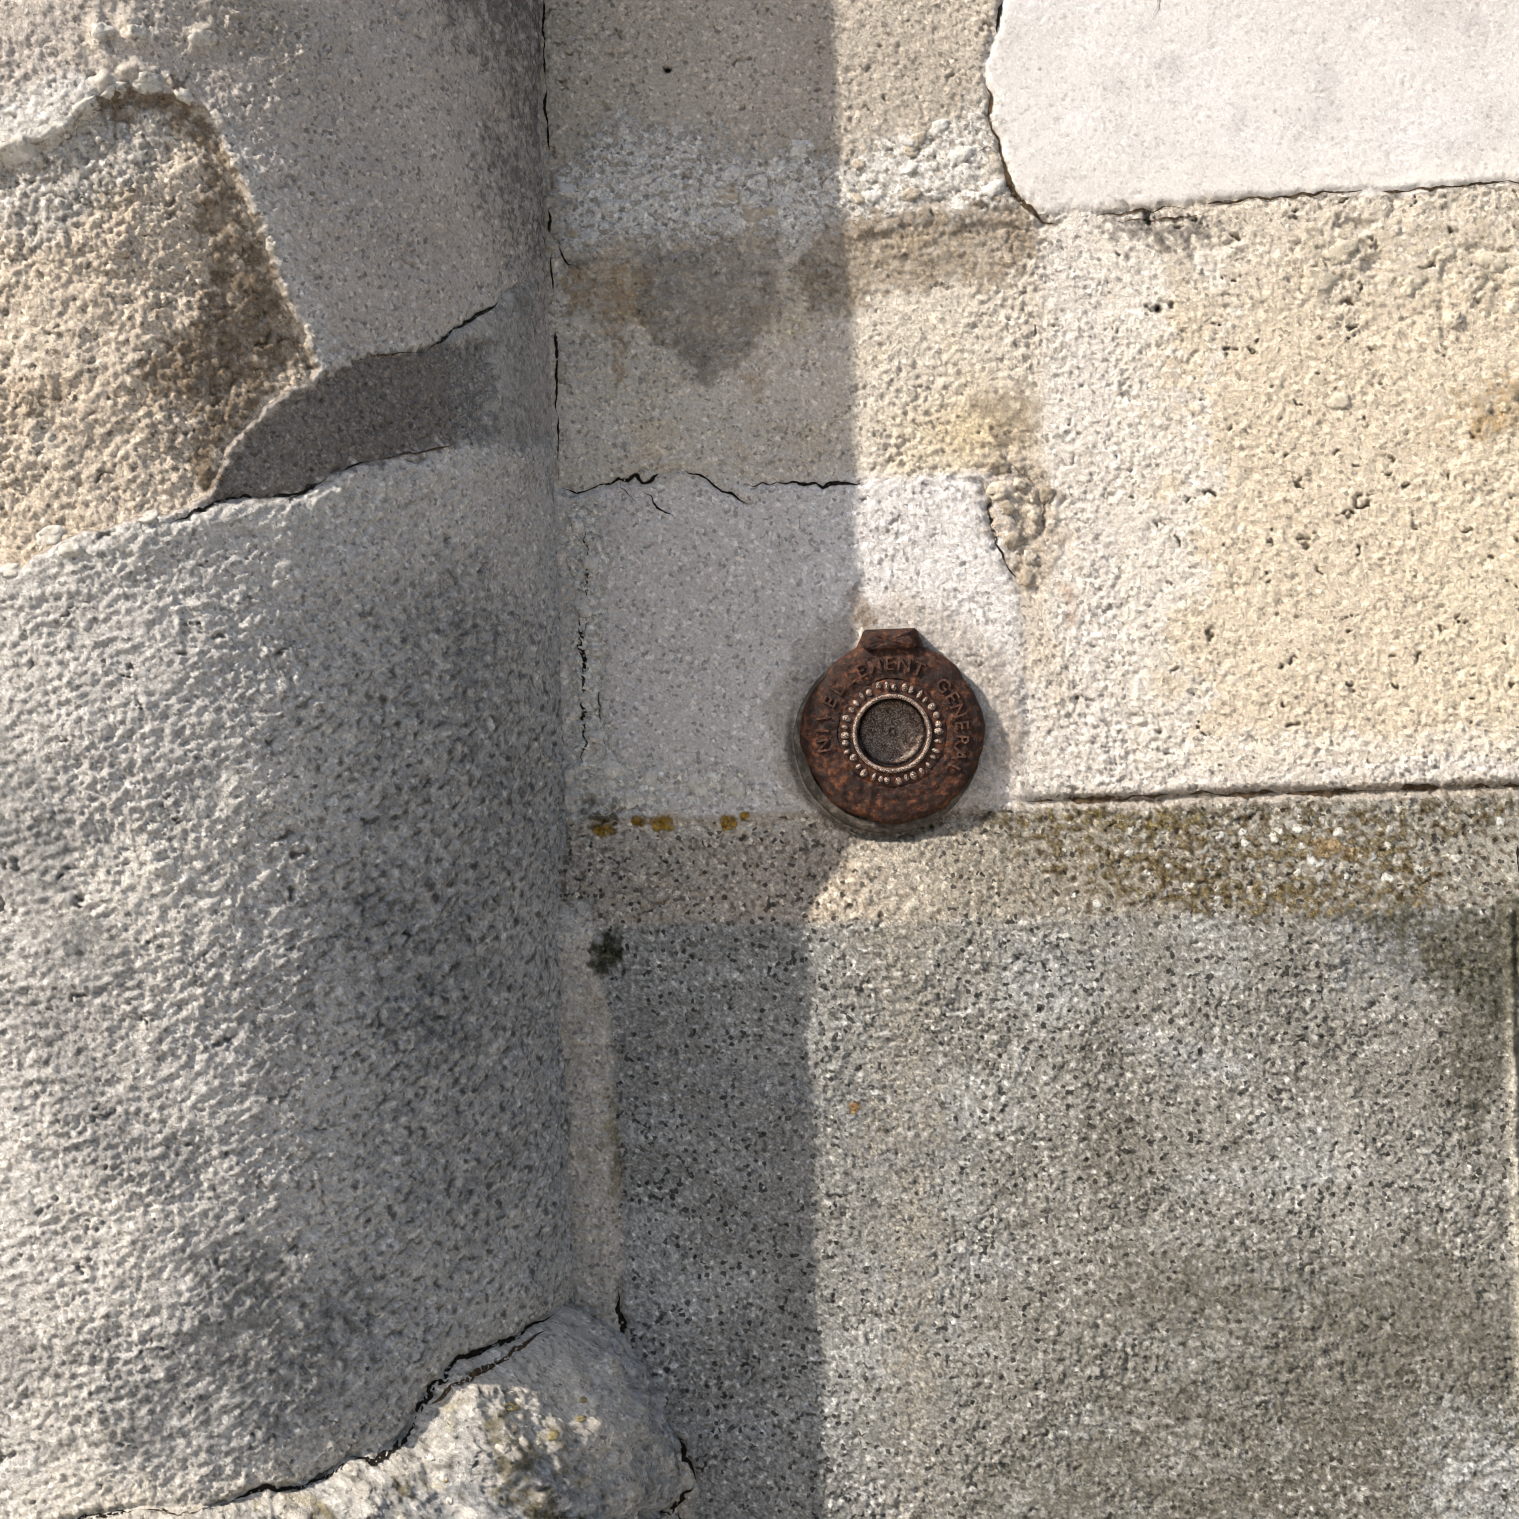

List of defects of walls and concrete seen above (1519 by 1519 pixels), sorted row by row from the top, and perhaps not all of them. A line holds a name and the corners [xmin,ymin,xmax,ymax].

spalling [188,28,219,47]
spalling [0,71,317,578]
crack [173,442,457,522]
crack [355,0,863,519]
leakage [635,187,1041,389]
leakage [970,386,1040,442]
crack [577,532,606,771]
crack [78,1308,561,1519]